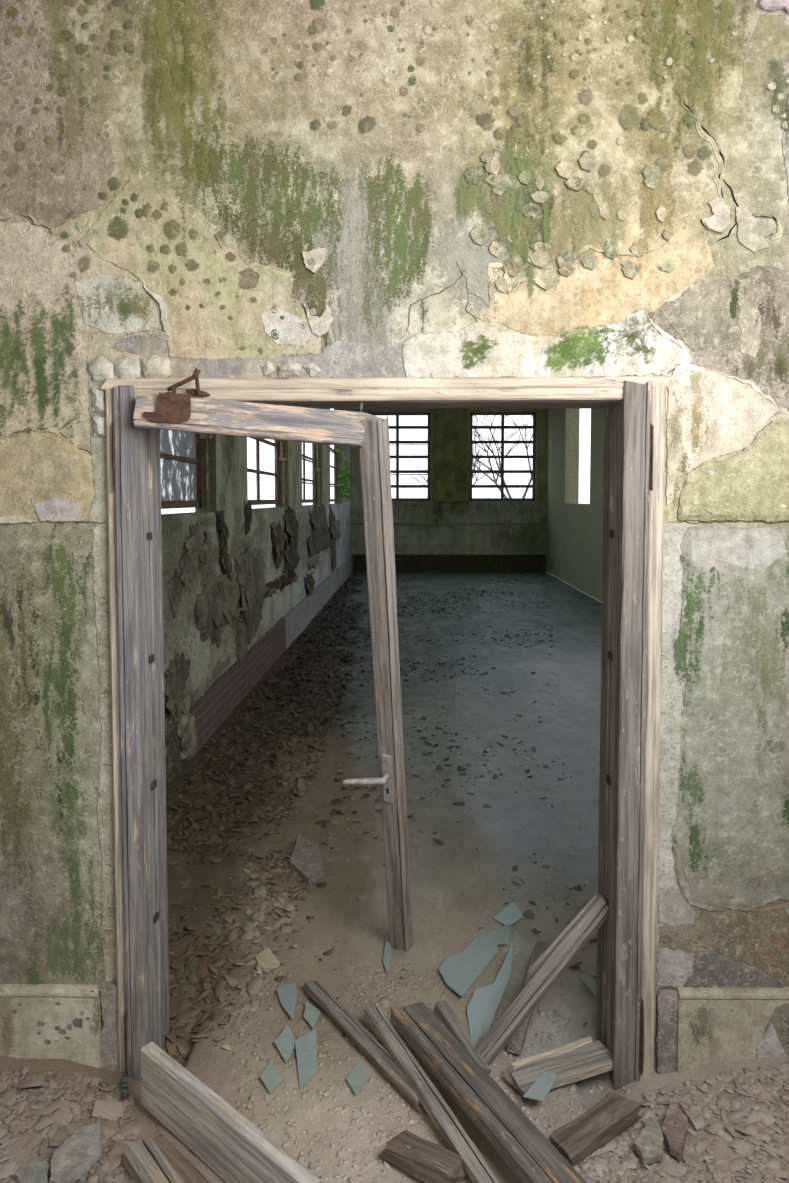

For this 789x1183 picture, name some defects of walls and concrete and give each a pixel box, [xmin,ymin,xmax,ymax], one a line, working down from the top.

damp [180,16,194,257]
damp [307,159,402,350]
peeling [0,0,789,523]
crack [680,101,739,241]
damp [11,346,60,440]
flaking render [164,501,342,782]
damp [684,594,704,682]
damp [0,576,96,985]
flaking render [92,523,119,1071]
damp [690,811,709,882]
peeling [655,525,789,1075]
peeling [37,1011,90,1045]